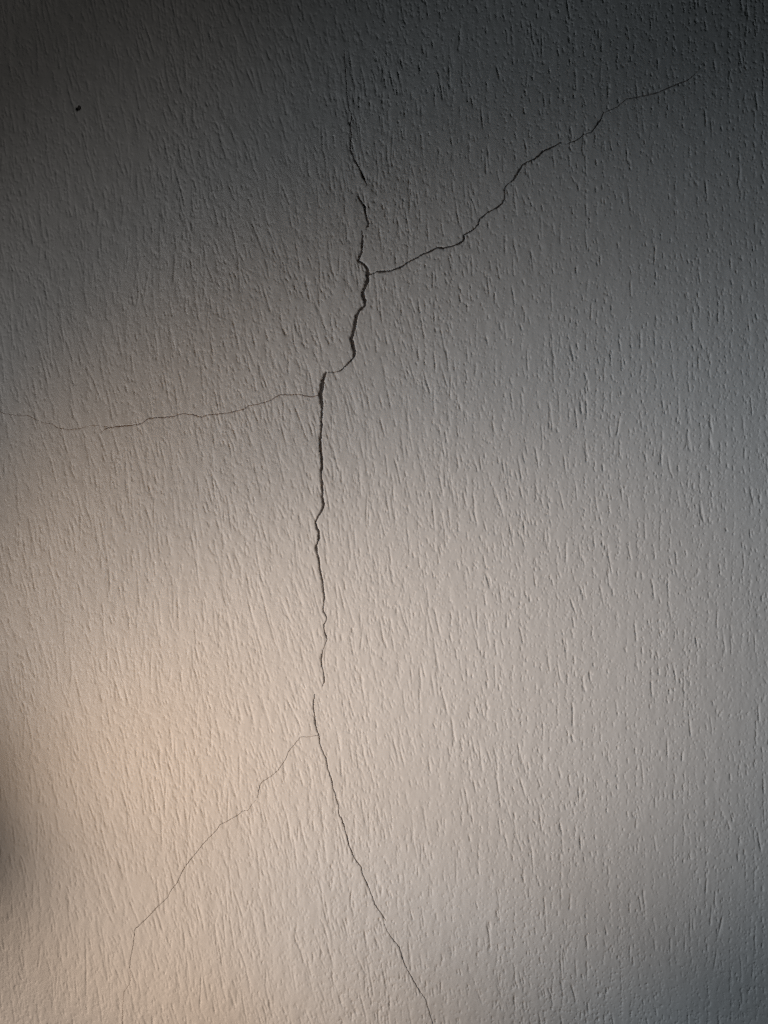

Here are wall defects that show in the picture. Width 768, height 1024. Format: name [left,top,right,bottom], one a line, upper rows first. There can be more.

crack [0,53,701,687]
crack [122,694,433,1024]